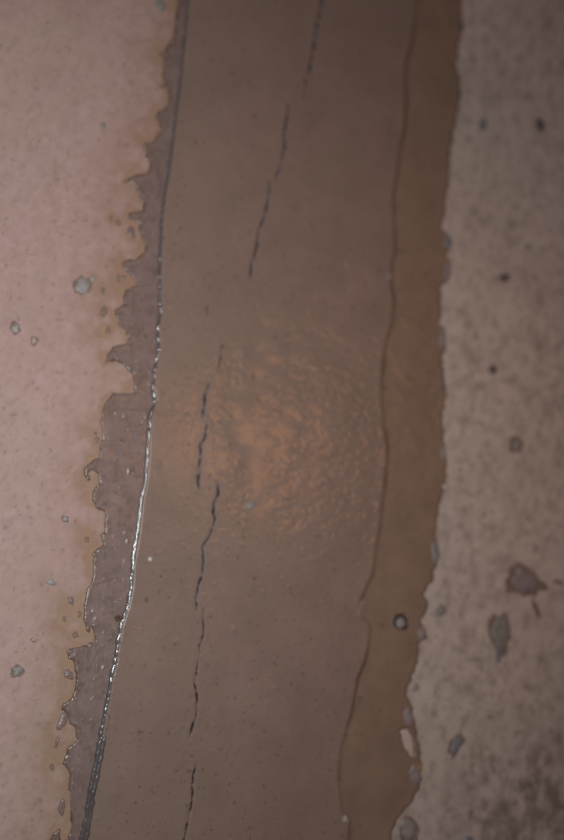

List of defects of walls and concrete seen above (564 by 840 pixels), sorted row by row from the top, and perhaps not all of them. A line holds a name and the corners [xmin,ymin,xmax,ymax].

crack [250,105,290,280]
peeling [50,0,187,840]
crack [189,344,223,738]
peeling [400,708,421,785]
flaking render [448,735,465,758]
crack [183,765,196,840]
spalling [400,817,419,840]